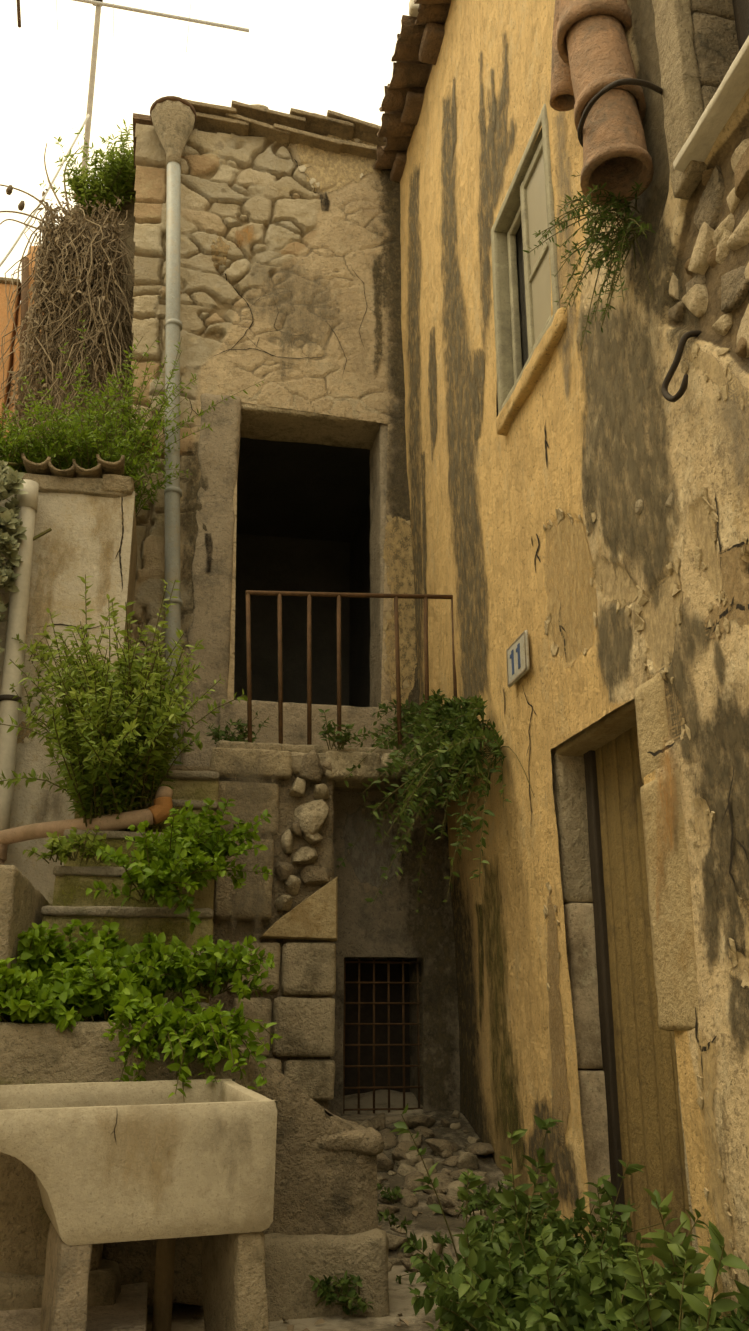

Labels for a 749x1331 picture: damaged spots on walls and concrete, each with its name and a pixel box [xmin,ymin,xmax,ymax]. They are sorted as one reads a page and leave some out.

peeling [290,134,378,211]
crack [214,269,374,377]
water stain [373,34,515,723]
water stain [557,116,698,605]
peeling [680,343,749,411]
water stain [597,604,632,699]
water stain [661,611,749,1054]